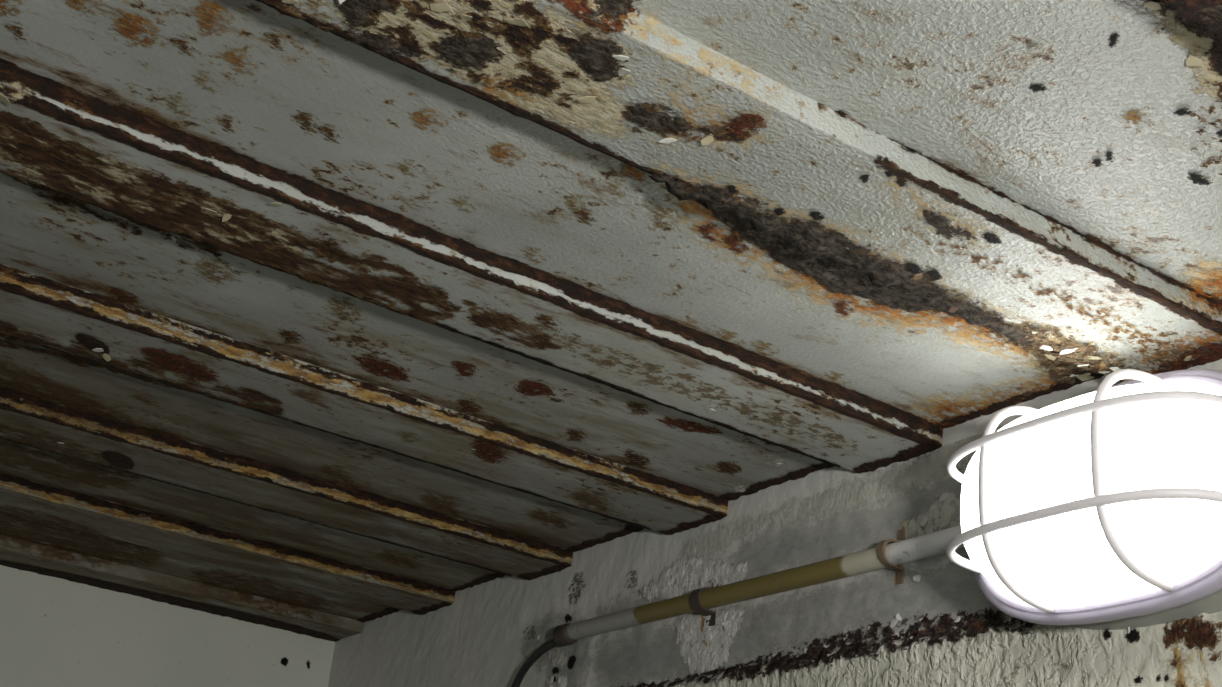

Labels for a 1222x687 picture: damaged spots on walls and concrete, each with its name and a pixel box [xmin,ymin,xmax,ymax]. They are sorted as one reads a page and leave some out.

corrosion [0,0,1105,476]
corrosion [835,108,1222,381]
corrosion [0,111,858,615]
corrosion [0,505,340,642]
corrosion [358,607,401,622]
spalling [522,614,592,687]
peeling [672,603,744,677]
corrosion [1162,616,1222,687]